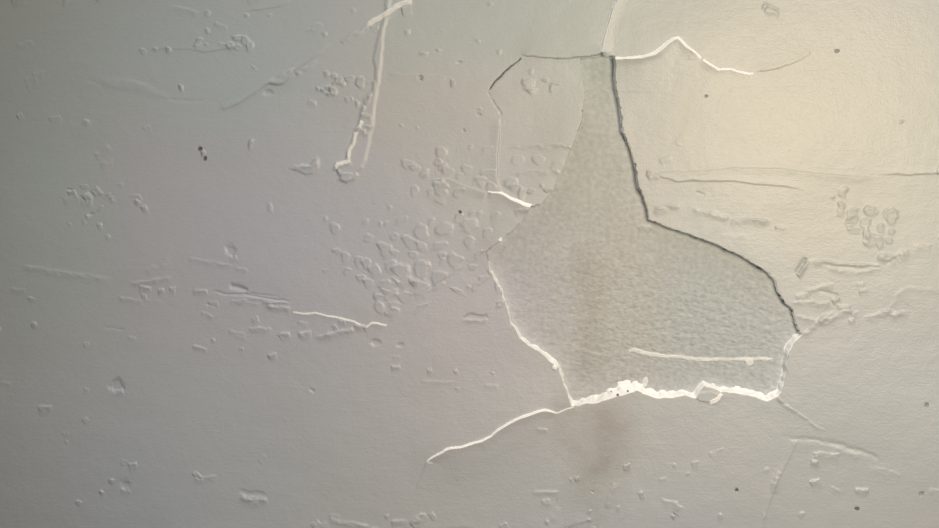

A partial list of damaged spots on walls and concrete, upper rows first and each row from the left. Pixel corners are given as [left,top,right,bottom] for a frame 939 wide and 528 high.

crack [431,36,816,208]
peeling [486,52,802,406]